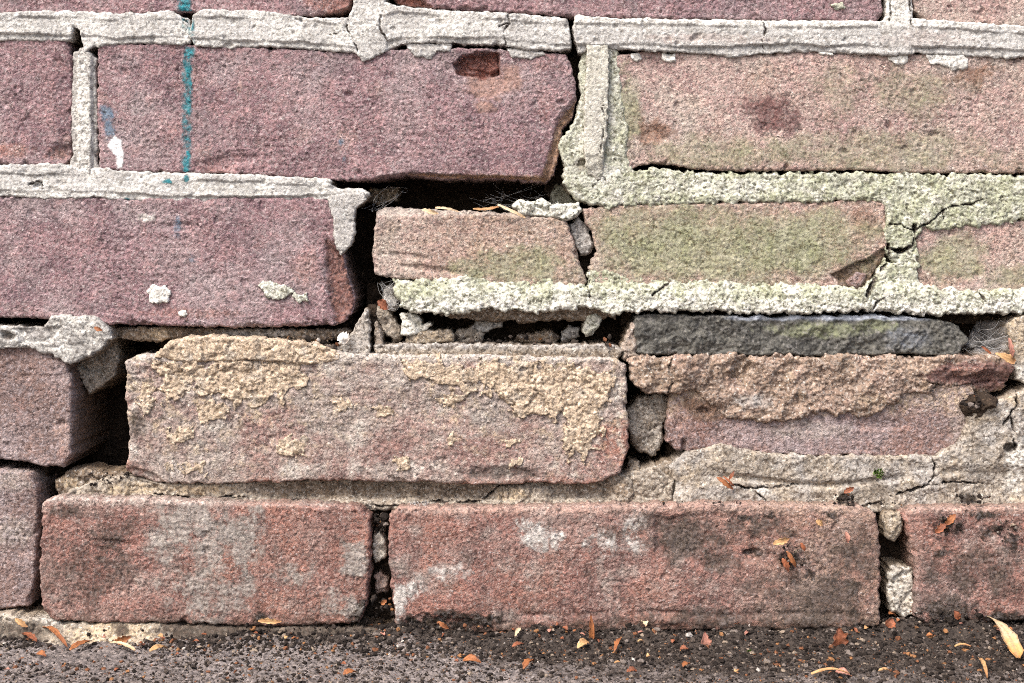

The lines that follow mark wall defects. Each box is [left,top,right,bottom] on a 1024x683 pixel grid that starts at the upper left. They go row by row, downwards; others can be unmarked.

crack [618,198,1002,326]
peeling [56,103,575,477]
peeling [484,315,626,344]
spalling [927,363,1012,390]
peeling [397,352,642,465]
spalling [684,397,723,422]
crack [1002,393,1019,450]
peeling [625,438,663,459]
crack [731,483,798,500]
crack [863,457,983,506]